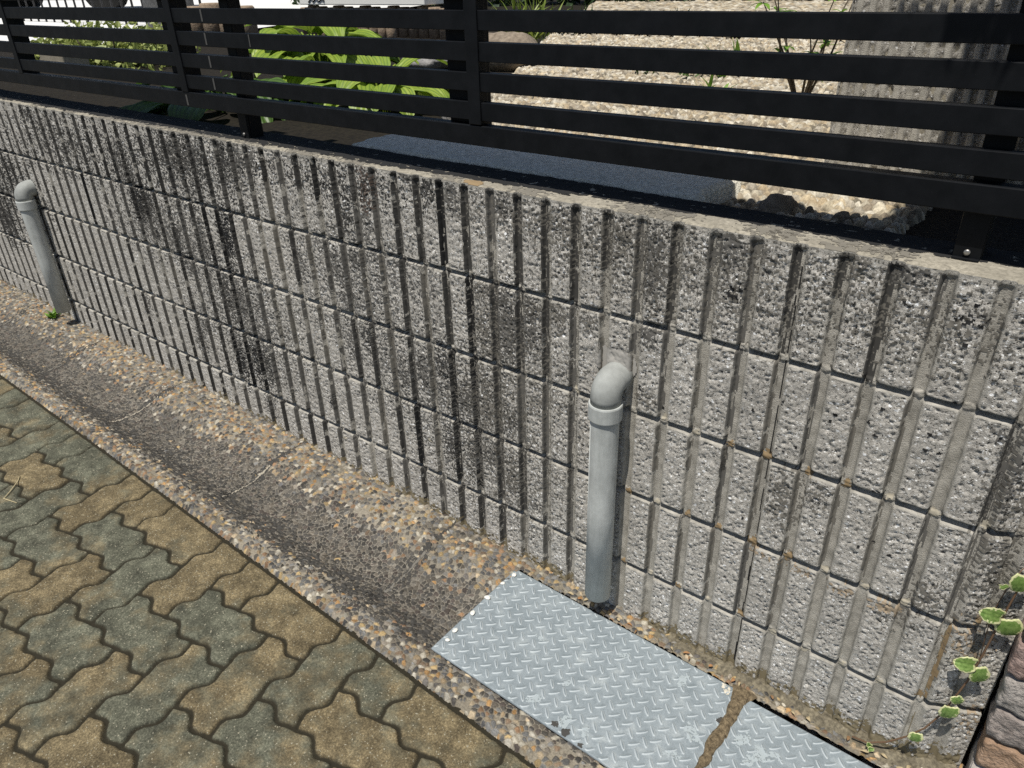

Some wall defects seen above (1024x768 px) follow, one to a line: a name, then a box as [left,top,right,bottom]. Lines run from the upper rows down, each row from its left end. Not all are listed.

water stain [0,101,1024,688]